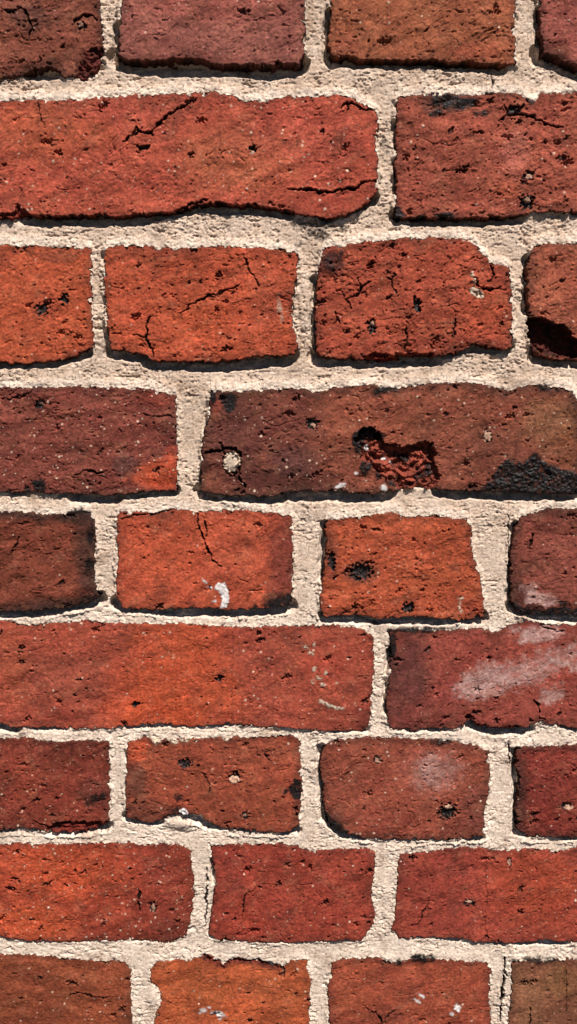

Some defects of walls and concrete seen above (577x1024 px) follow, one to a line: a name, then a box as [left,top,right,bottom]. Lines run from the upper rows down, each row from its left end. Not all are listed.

crack [126,103,191,141]
crack [288,180,376,195]
crack [185,258,260,311]
crack [139,316,154,357]
spalling [357,426,442,489]
crack [197,513,221,566]